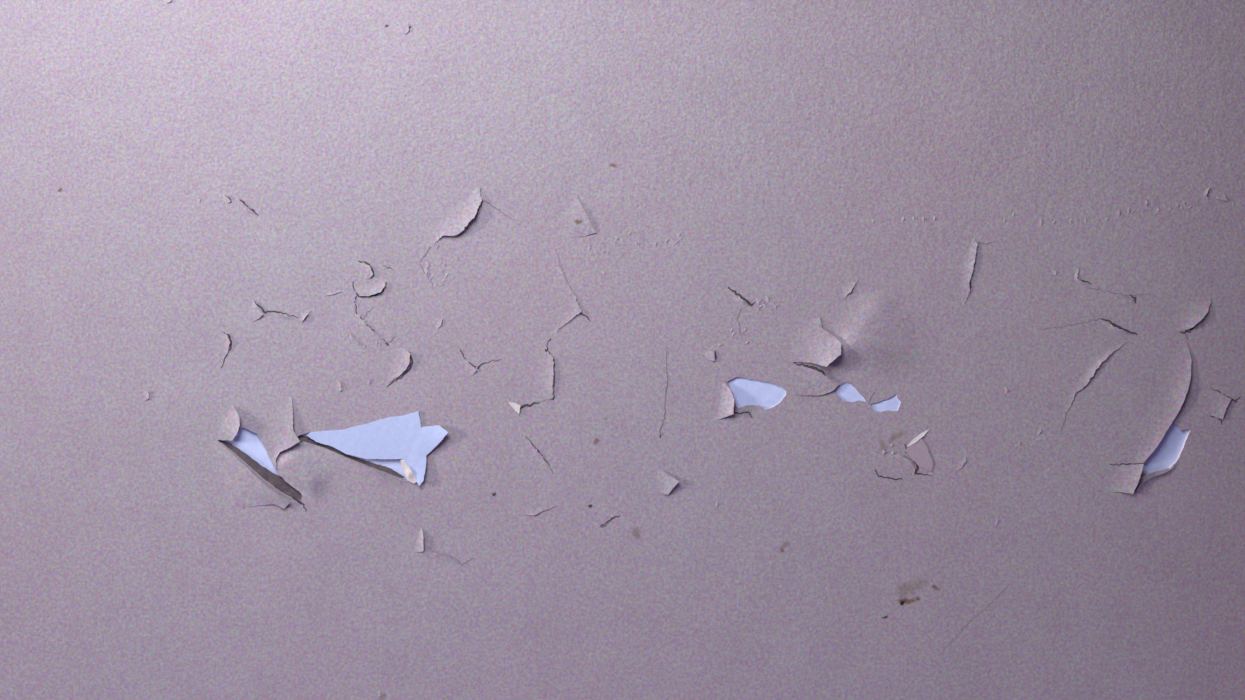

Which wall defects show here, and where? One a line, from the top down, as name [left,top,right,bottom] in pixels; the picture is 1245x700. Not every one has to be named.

peeling [420,187,510,263]
peeling [564,197,596,238]
peeling [324,261,392,298]
peeling [960,239,996,307]
peeling [387,346,413,387]
peeling [508,349,555,414]
peeling [715,318,901,421]
peeling [1103,335,1192,494]
peeling [1209,387,1240,425]
peeling [212,394,448,512]
peeling [655,469,679,495]
peeling [875,429,933,487]